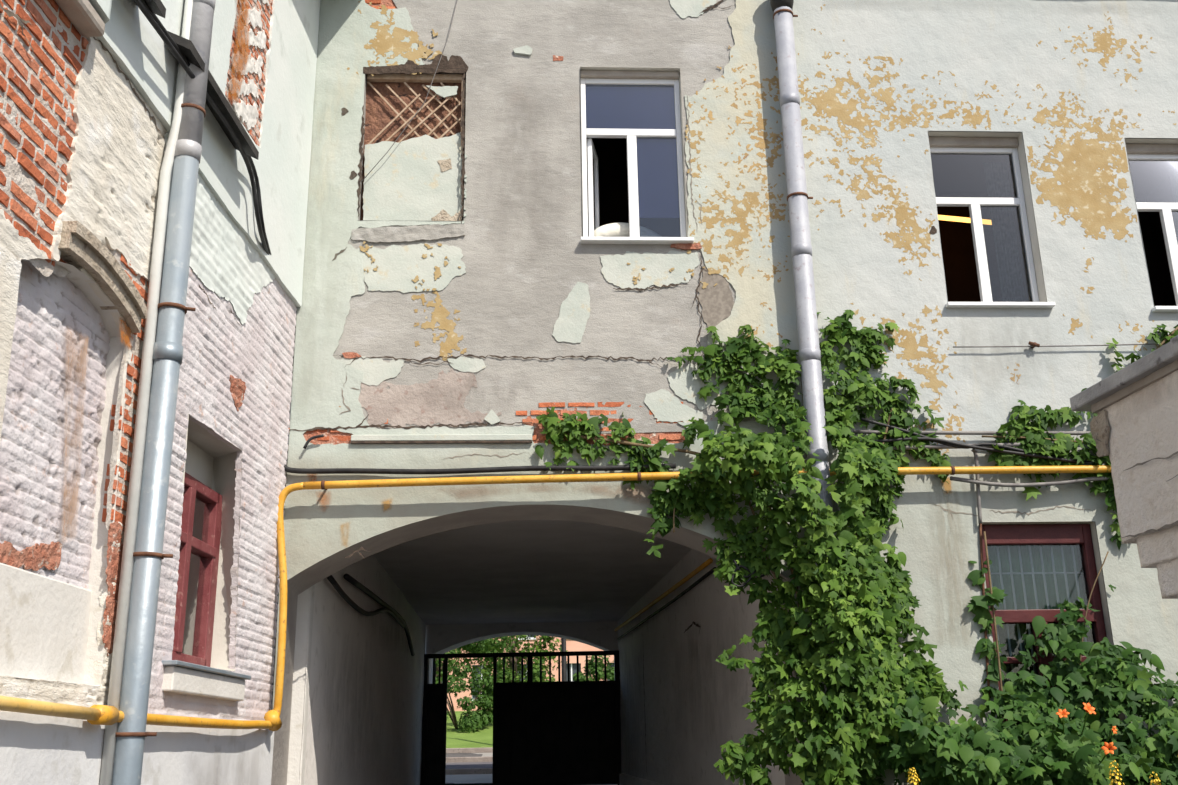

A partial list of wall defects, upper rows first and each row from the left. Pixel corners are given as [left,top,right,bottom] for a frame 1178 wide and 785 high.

flaking render [0,0,89,277]
flaking render [225,0,273,146]
crack [357,105,365,217]
flaking render [333,0,790,446]
crack [687,96,702,224]
peeling [798,40,1144,281]
flaking render [0,541,62,571]
flaking render [102,245,149,656]
crack [289,252,713,459]
peeling [850,303,966,455]
crack [1122,520,1178,538]
crack [1124,451,1178,482]